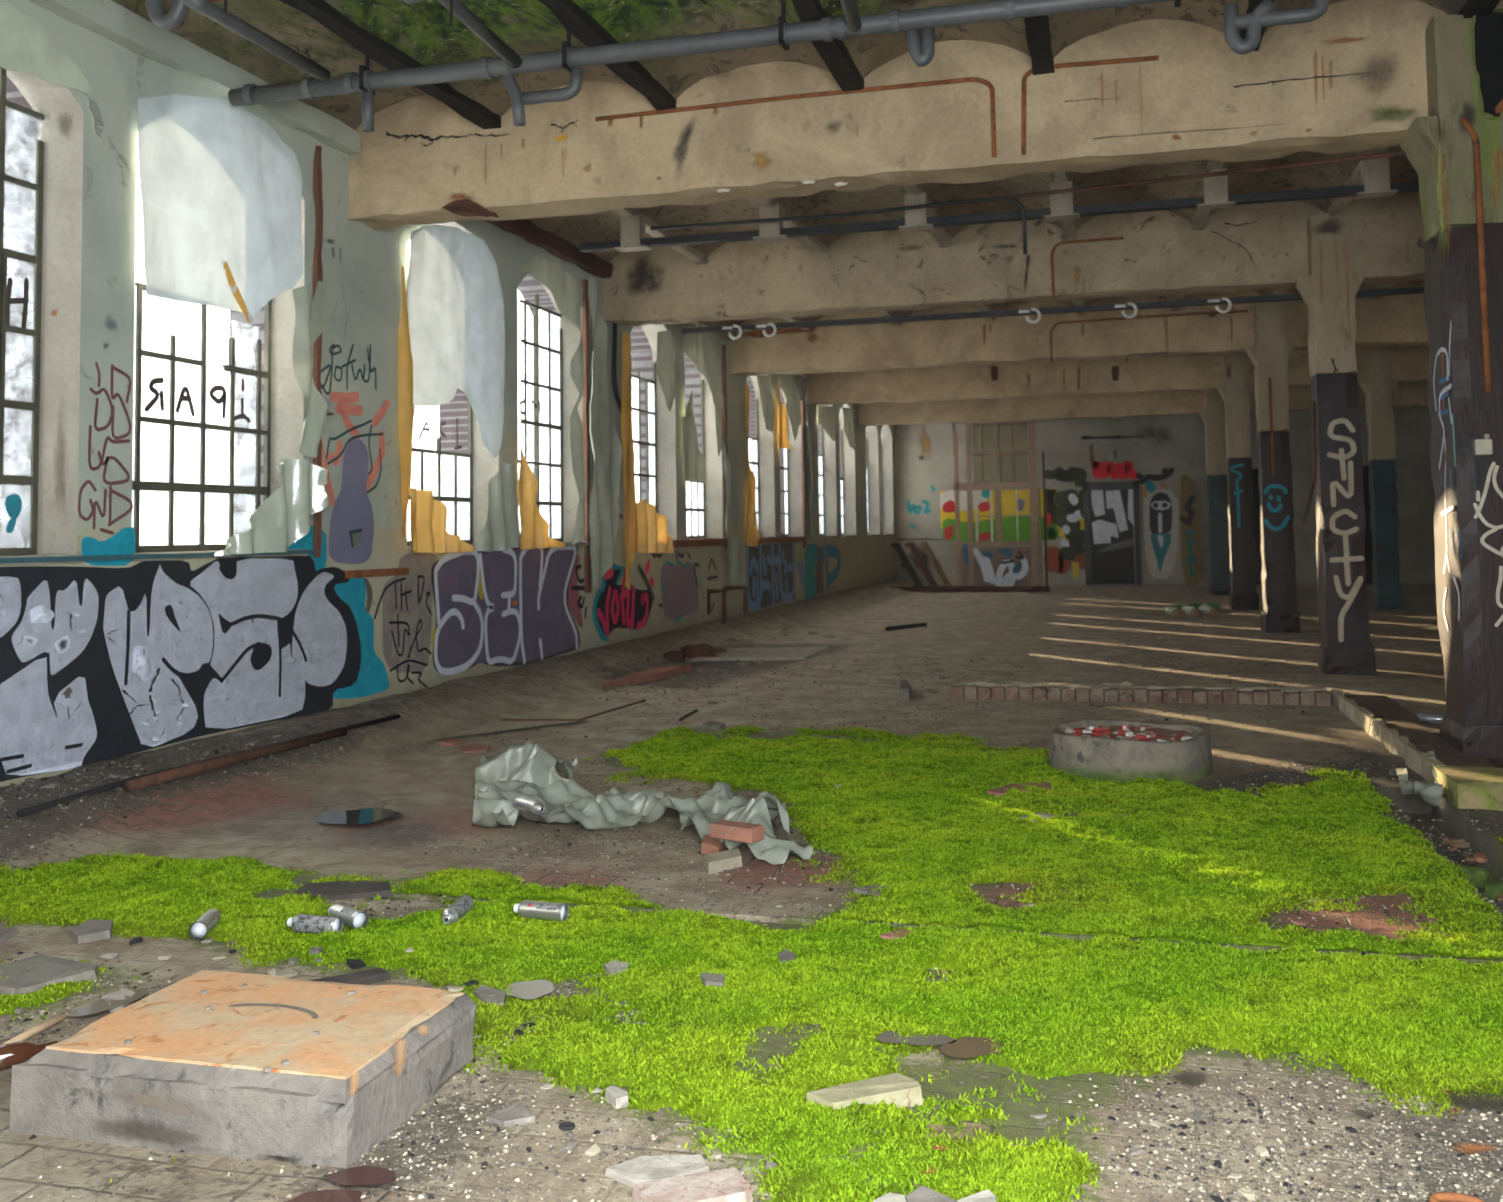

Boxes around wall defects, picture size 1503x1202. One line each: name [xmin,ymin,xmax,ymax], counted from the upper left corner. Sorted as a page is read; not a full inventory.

spalling [1472,8,1503,122]
crack [551,120,578,134]
crack [386,132,509,146]